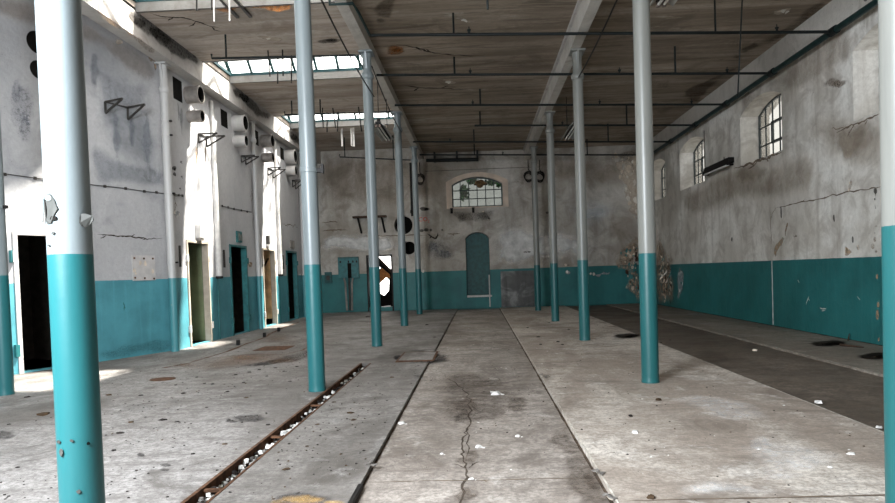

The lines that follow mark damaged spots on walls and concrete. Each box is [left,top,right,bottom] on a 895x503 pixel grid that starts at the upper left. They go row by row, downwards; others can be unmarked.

crack [99,233,161,241]
crack [770,187,878,241]
flaking render [590,239,639,297]
peeling [656,243,683,304]
crack [439,371,479,503]